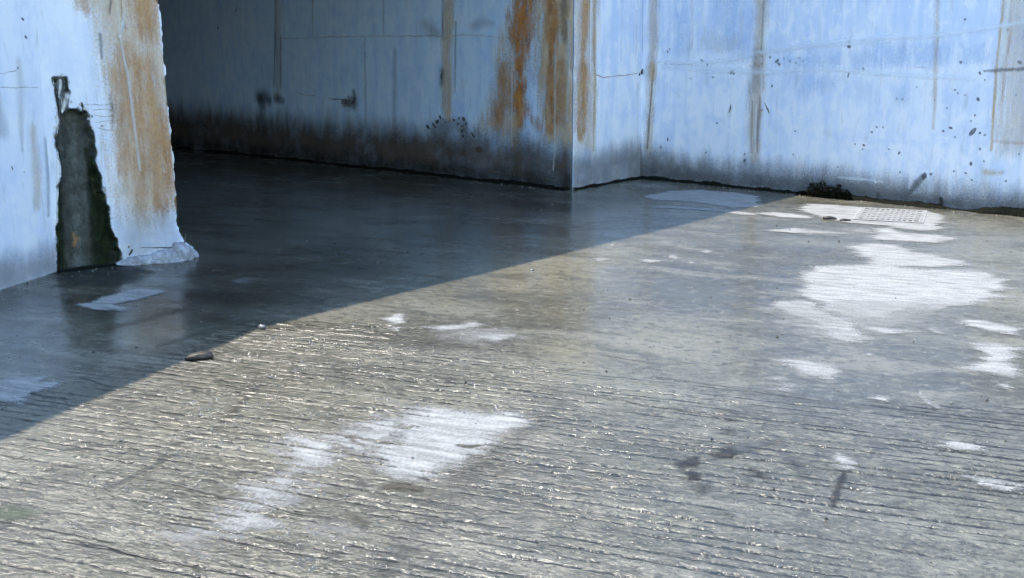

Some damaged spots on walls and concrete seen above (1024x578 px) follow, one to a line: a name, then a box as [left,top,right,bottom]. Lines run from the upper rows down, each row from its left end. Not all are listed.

spalling [51,73,133,269]
corrosion [95,0,171,210]
corrosion [482,0,592,146]
damp [168,0,1024,210]
crack [593,0,637,150]